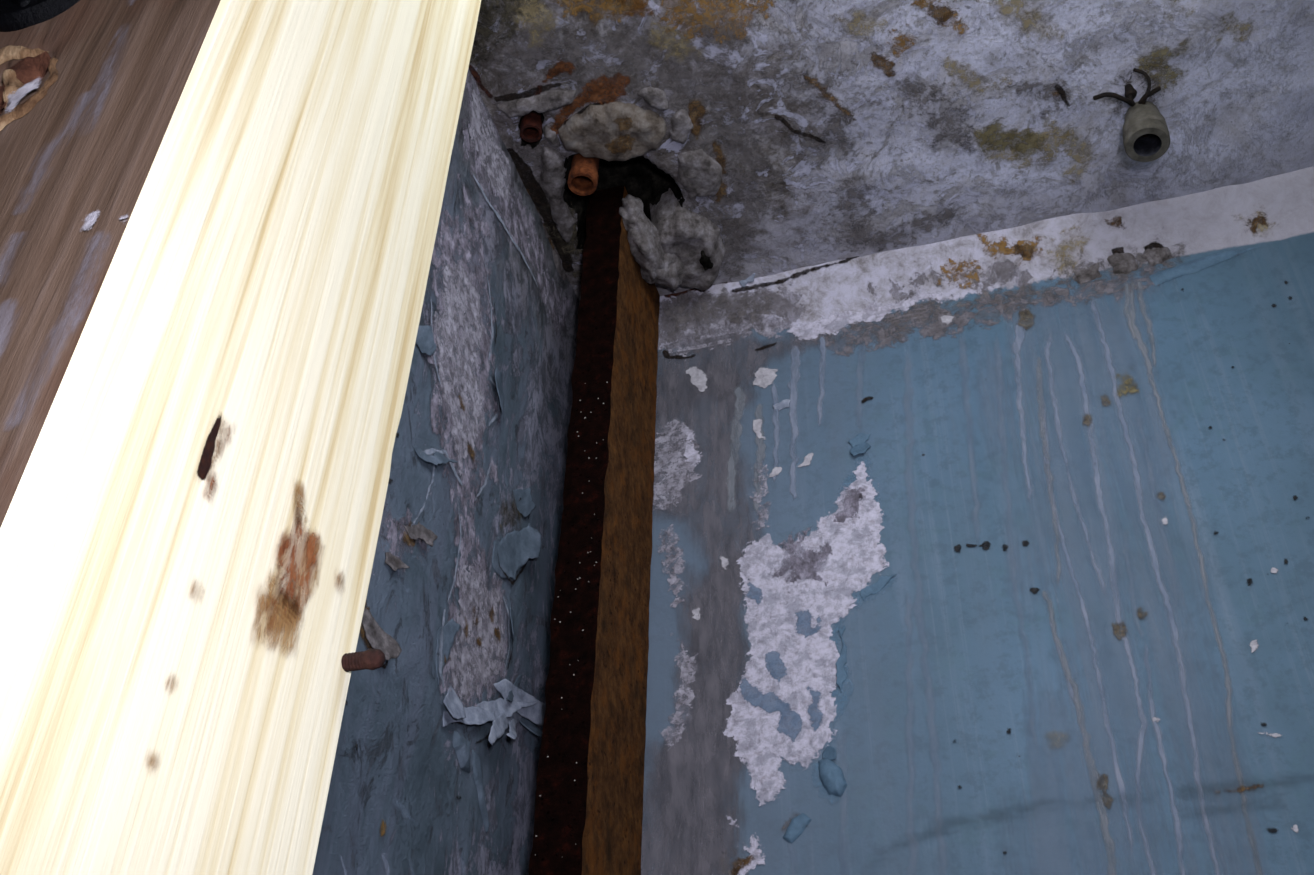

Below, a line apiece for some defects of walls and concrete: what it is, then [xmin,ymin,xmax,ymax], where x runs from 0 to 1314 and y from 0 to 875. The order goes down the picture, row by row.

spalling [0,51,51,114]
water stain [469,0,853,357]
water stain [829,177,963,251]
water stain [911,0,969,35]
water stain [838,12,1091,181]
water stain [977,0,1063,39]
water stain [1108,39,1188,115]
spalling [378,58,1184,748]
rust [255,485,322,650]
water stain [641,347,800,875]
peeling [720,433,897,806]
water stain [811,227,1261,875]